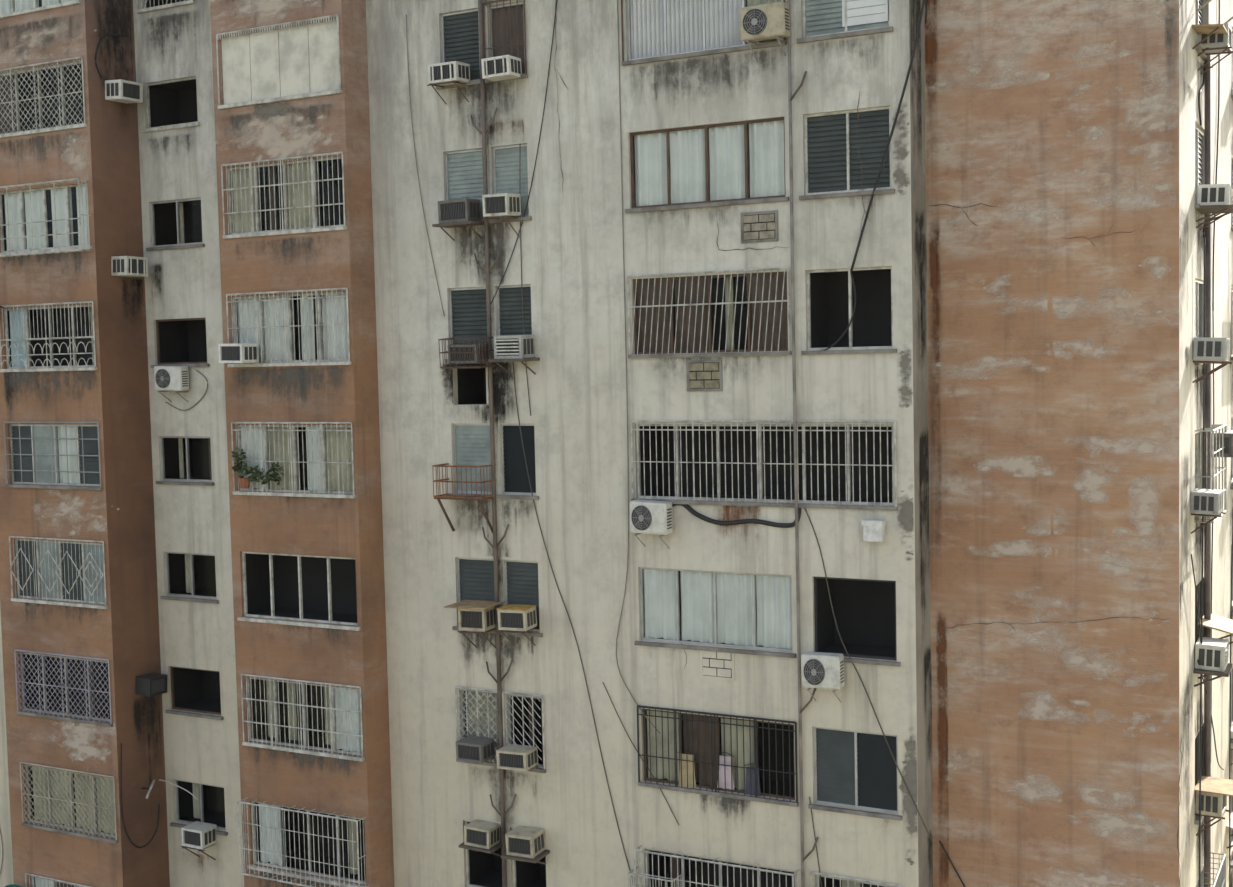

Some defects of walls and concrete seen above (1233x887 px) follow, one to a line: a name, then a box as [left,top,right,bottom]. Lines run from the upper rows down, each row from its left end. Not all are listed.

leakage [97,0,132,80]
leakage [148,13,189,46]
leakage [457,76,508,115]
crack [927,203,995,226]
leakage [455,222,508,281]
peeling [1090,437,1165,456]
peeling [979,456,1054,477]
peeling [1074,469,1119,502]
peeling [1111,477,1158,547]
peeling [992,508,1062,557]
crack [941,617,1167,631]